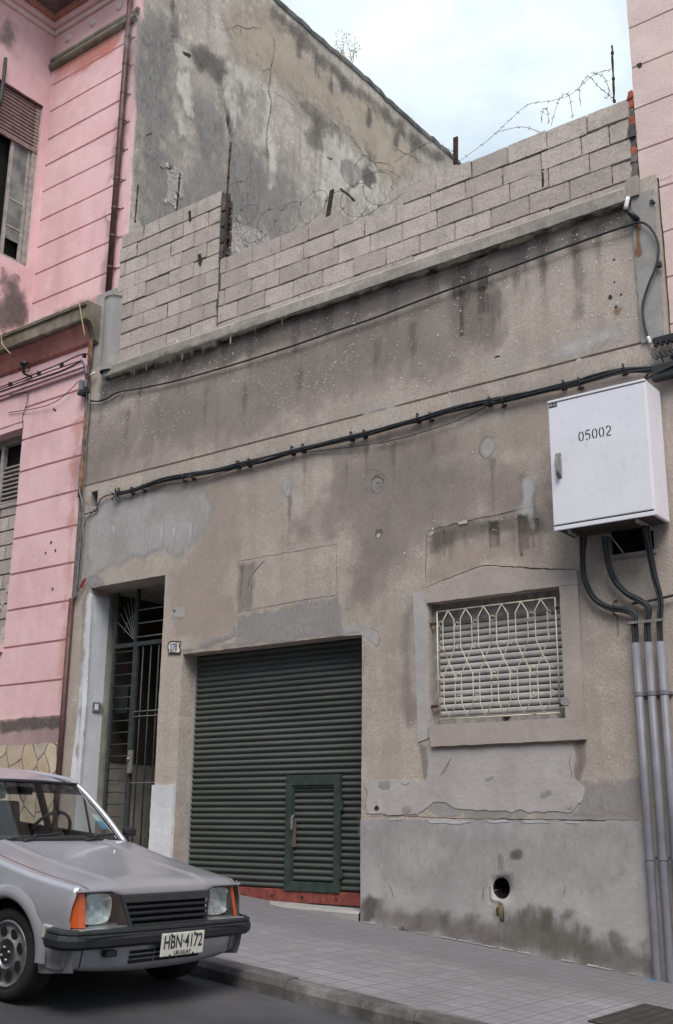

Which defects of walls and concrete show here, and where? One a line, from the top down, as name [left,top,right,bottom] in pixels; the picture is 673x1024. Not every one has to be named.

water stain [191,46,224,81]
crack [232,25,297,161]
spalling [160,162,185,211]
water stain [0,275,28,331]
spalling [427,802,550,824]
crack [370,814,624,822]
water stain [362,896,376,922]
water stain [399,915,496,945]